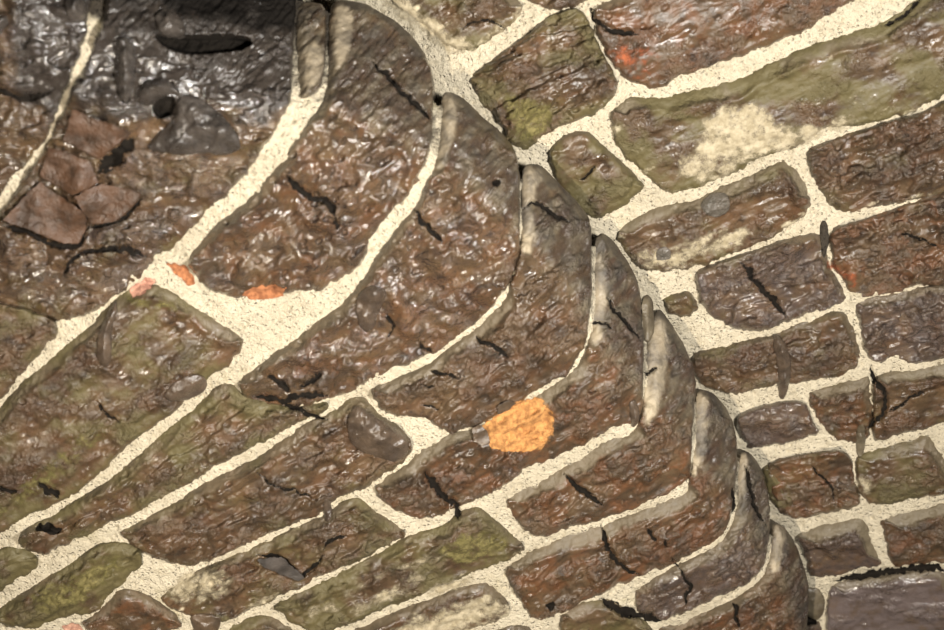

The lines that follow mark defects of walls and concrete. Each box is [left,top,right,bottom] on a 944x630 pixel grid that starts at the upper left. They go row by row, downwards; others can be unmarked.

crack [98,137,135,174]
crack [5,198,146,274]
crack [742,263,786,317]
crack [566,474,637,575]